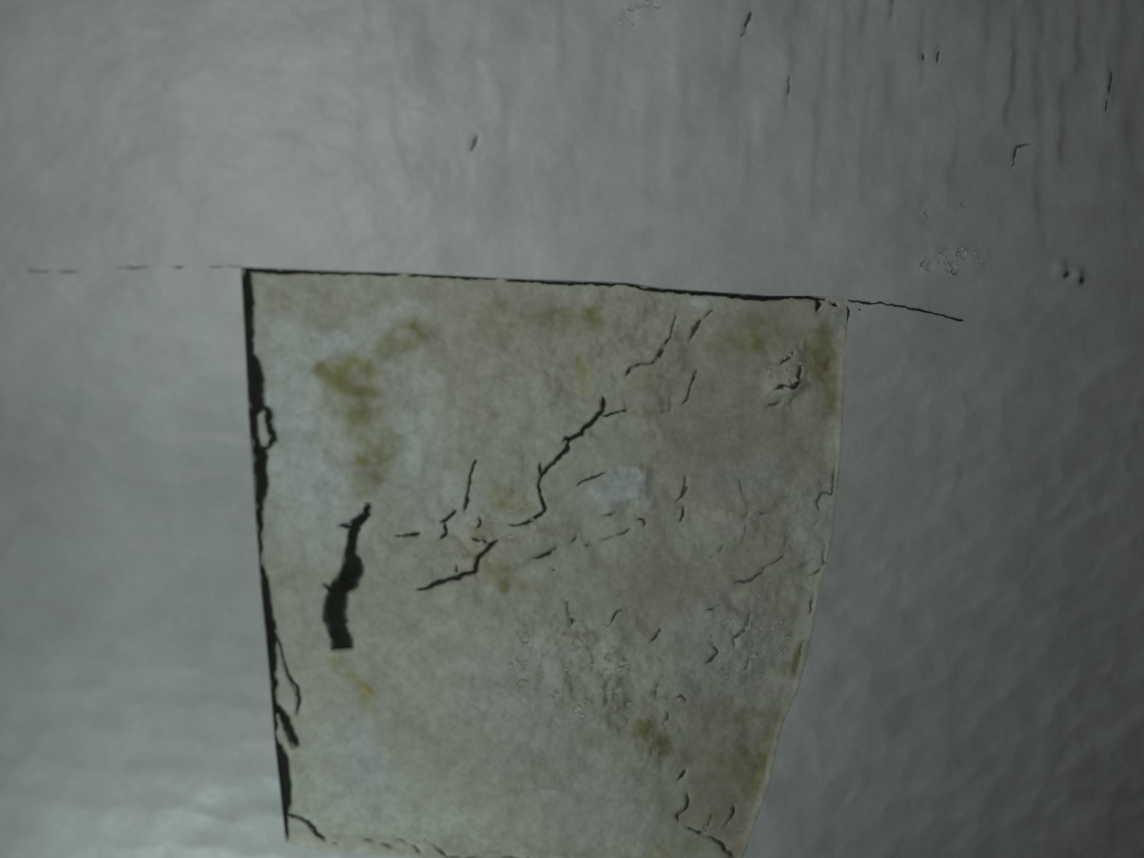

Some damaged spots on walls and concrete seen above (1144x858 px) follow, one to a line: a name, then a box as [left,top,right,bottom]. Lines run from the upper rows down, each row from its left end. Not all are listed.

water stain [308,309,434,517]
water stain [471,295,610,399]
water stain [702,310,771,362]
water stain [804,308,845,423]
water stain [477,560,544,597]
flaking render [241,267,848,858]
crack [238,266,963,855]
water stain [322,654,378,716]
water stain [696,698,783,805]